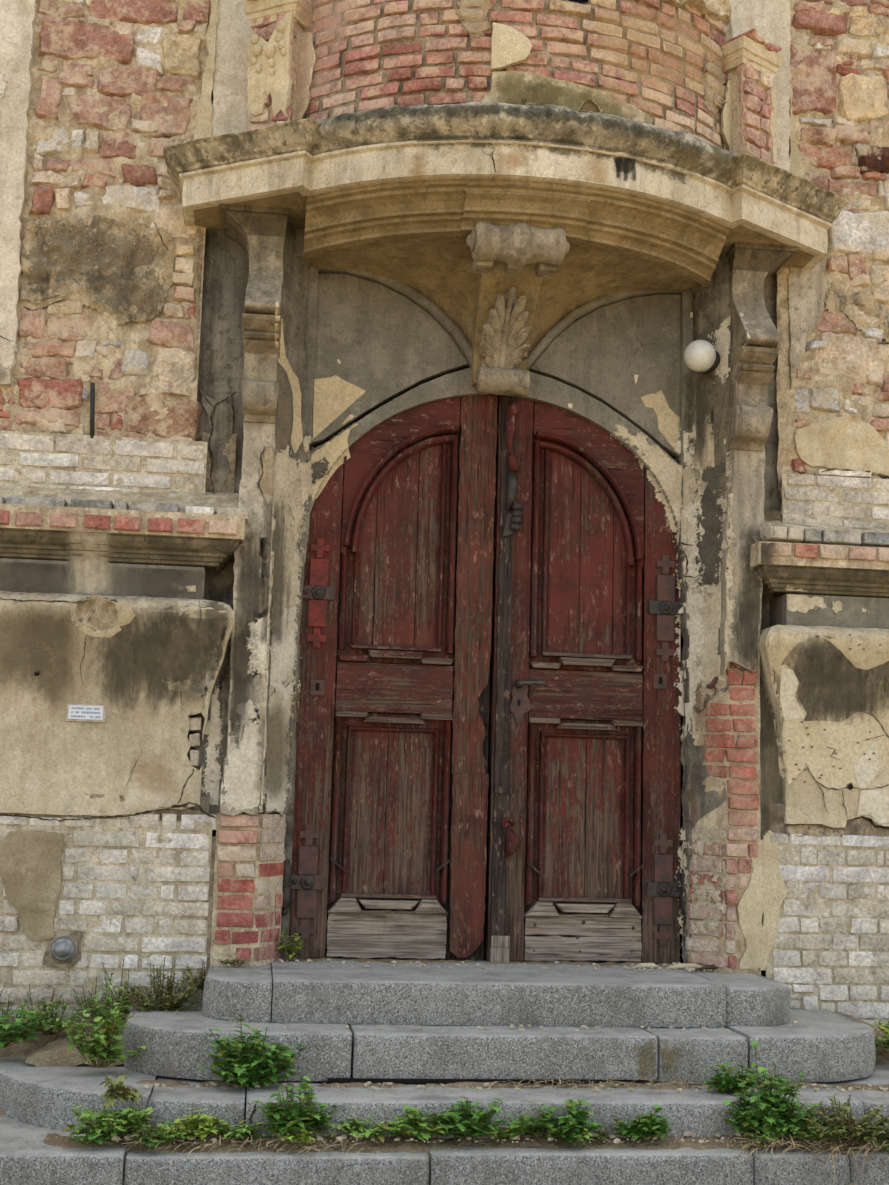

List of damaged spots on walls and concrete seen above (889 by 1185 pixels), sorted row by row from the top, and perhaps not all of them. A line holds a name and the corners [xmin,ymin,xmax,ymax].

damp [414,129,686,184]
spalling [21,215,177,324]
damp [202,237,214,304]
damp [0,530,264,742]
peeling [163,301,365,820]
peeling [610,306,758,741]
peeling [785,585,843,614]
damp [794,641,889,721]
crack [0,802,216,822]
peeling [774,664,889,837]
crack [805,747,889,818]
spalling [674,823,731,959]